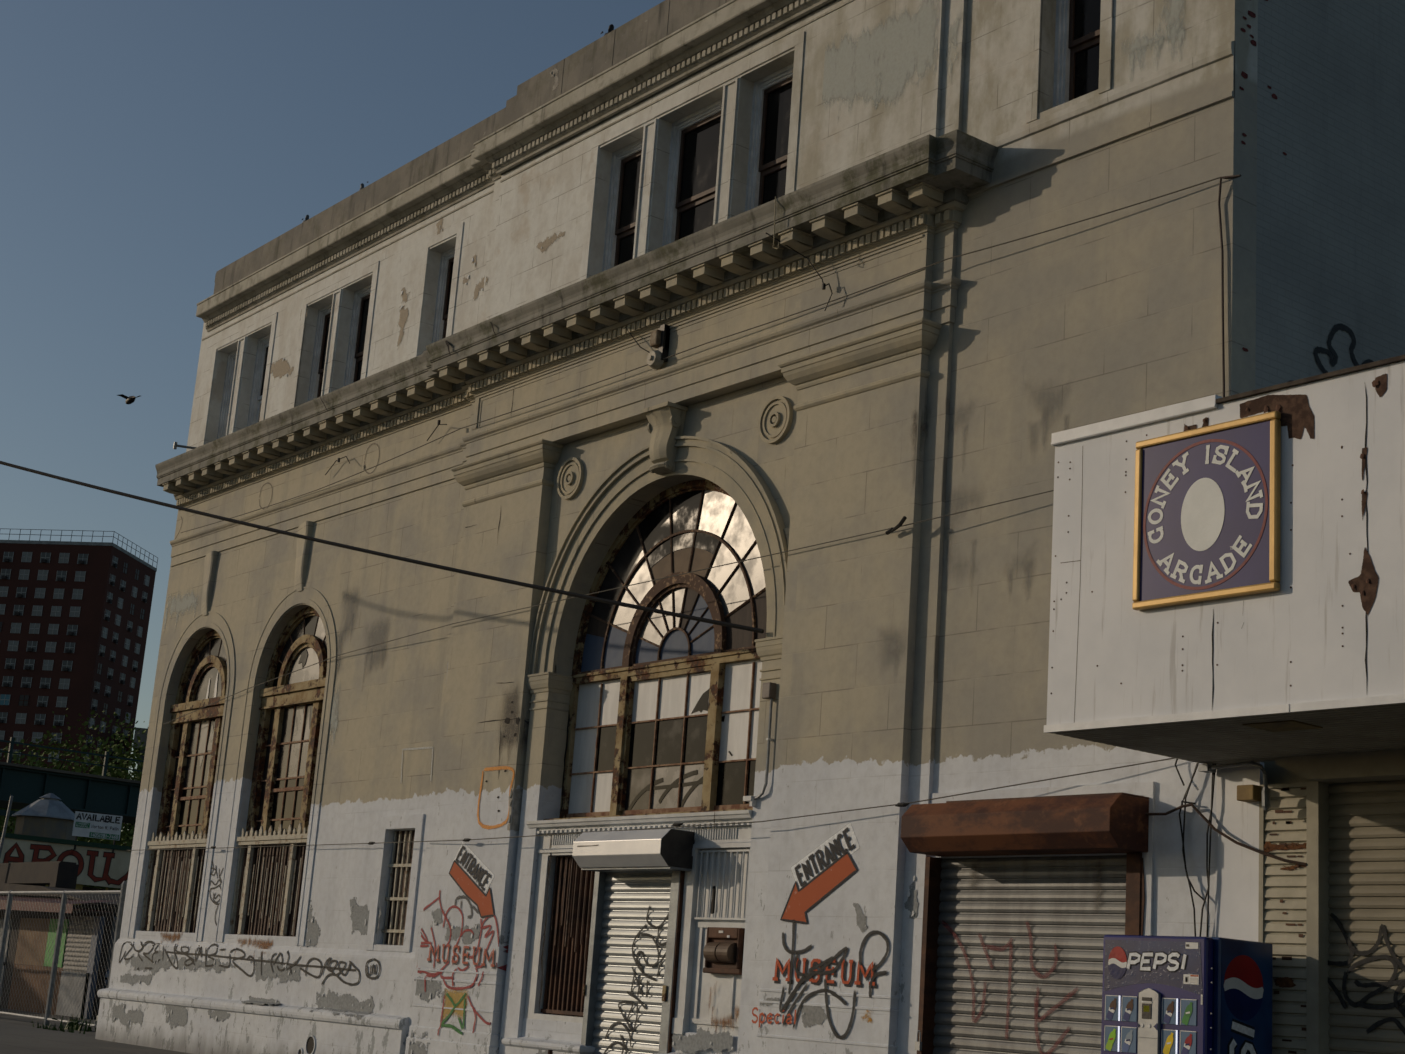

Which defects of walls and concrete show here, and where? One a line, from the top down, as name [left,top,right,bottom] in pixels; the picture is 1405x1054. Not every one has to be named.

peeling [463,255,488,301]
peeling [397,287,409,346]
peeling [270,358,294,378]
peeling [120,900,321,1022]
peeling [112,1003,143,1030]
peeling [164,996,188,1030]
peeling [310,990,374,1020]
peeling [403,1030,431,1054]